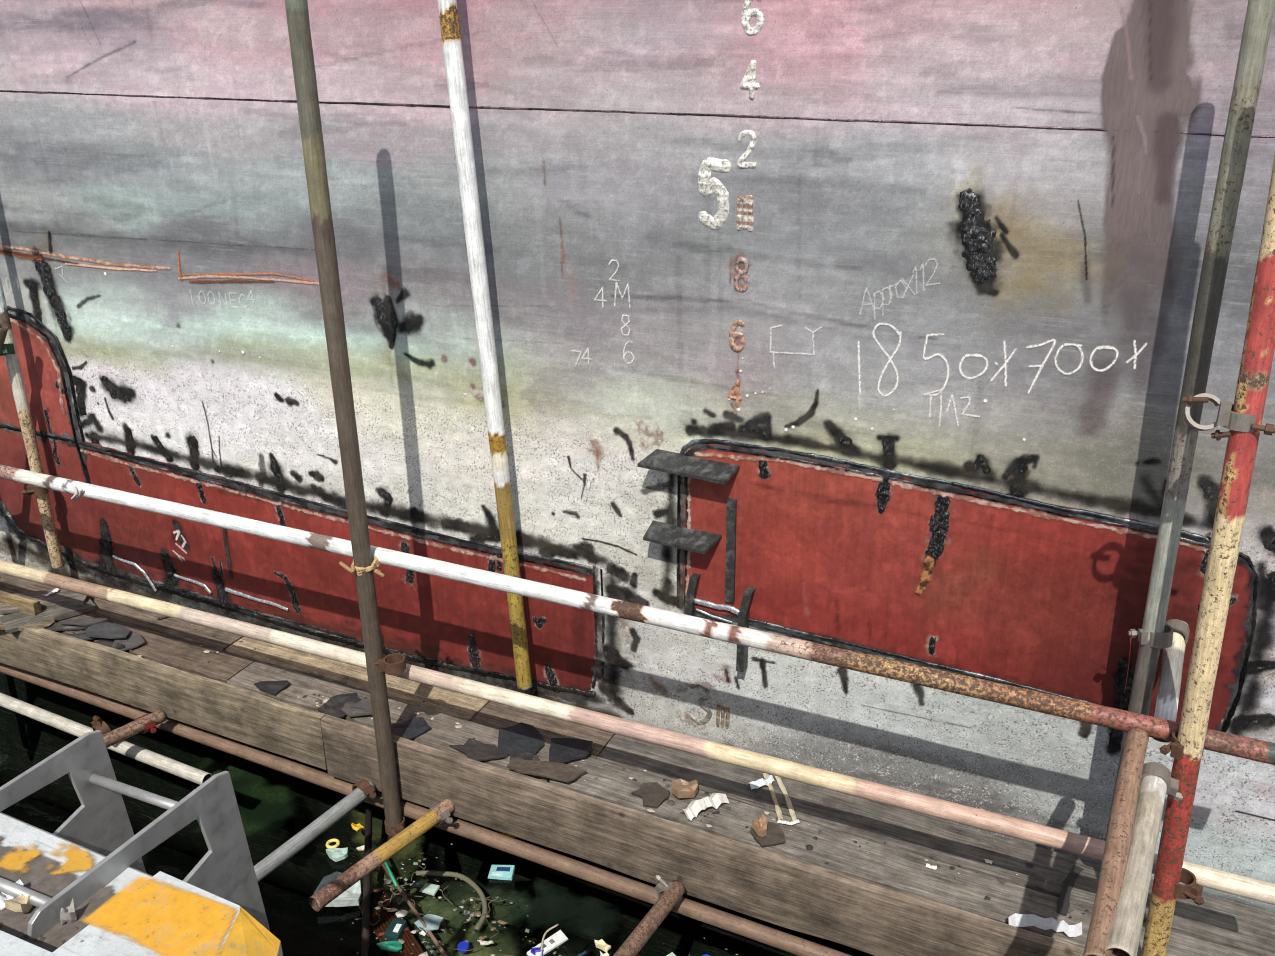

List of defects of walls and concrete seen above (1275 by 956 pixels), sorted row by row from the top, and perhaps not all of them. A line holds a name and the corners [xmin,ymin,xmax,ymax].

water stain [1102,0,1200,285]
rust [915,556,935,595]